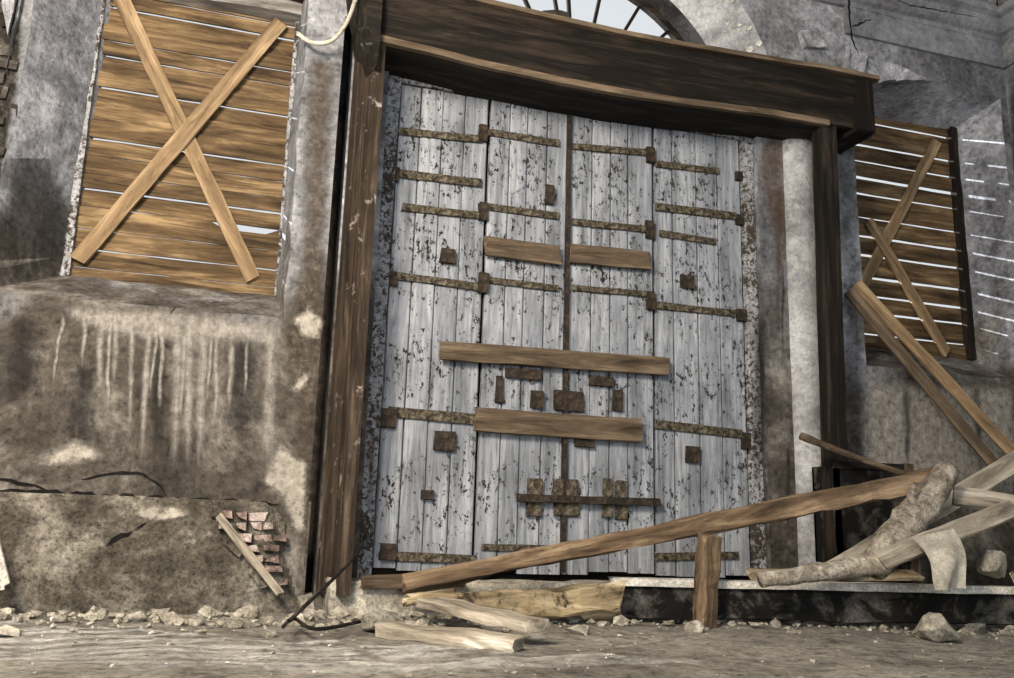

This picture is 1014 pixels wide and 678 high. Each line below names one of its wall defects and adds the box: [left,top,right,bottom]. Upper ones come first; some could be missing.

spalling [0,0,24,174]
peeling [7,158,64,261]
damp [76,64,329,530]
damp [50,444,96,463]
crack [0,471,278,506]
crack [106,521,148,546]
spalling [205,501,288,589]